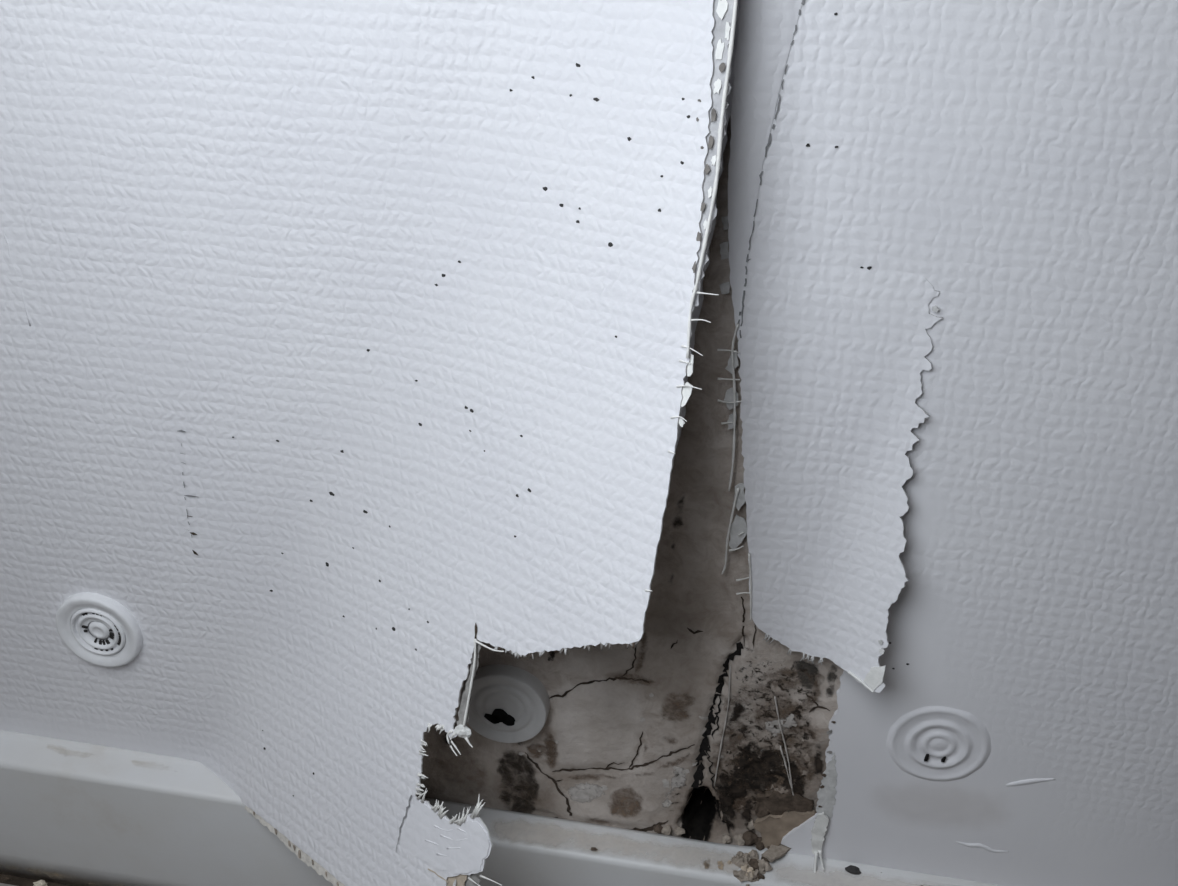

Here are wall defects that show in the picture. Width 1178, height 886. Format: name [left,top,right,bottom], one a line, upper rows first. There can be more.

peeling [715,0,731,59]
spalling [420,115,844,850]
crack [525,597,757,832]
leakage [715,661,837,833]
leakage [703,849,765,886]